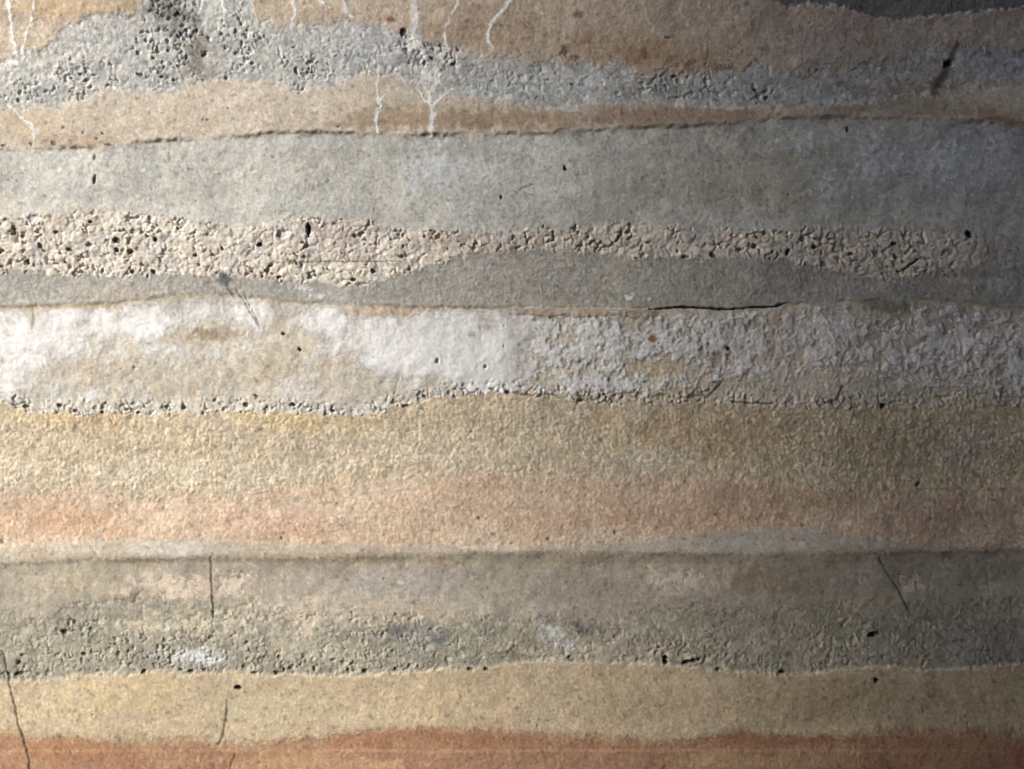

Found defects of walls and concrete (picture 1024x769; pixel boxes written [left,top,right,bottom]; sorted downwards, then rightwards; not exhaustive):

leakage [6,0,35,65]
leakage [486,0,512,49]
leakage [407,0,459,138]
leakage [374,74,388,134]
crack [655,303,782,311]